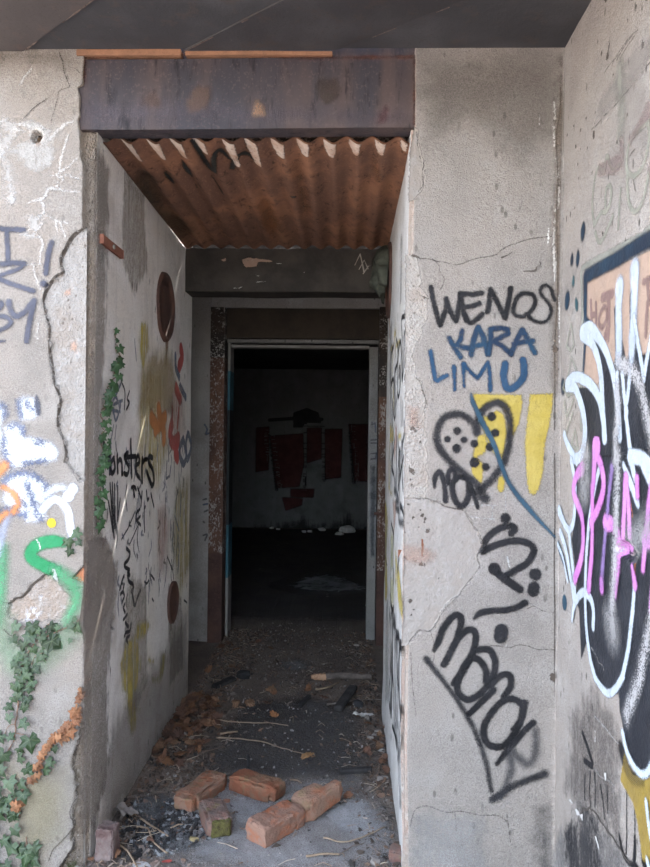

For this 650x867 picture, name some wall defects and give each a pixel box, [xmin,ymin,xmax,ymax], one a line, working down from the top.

crack [421,235,560,288]
spalling [4,538,114,641]